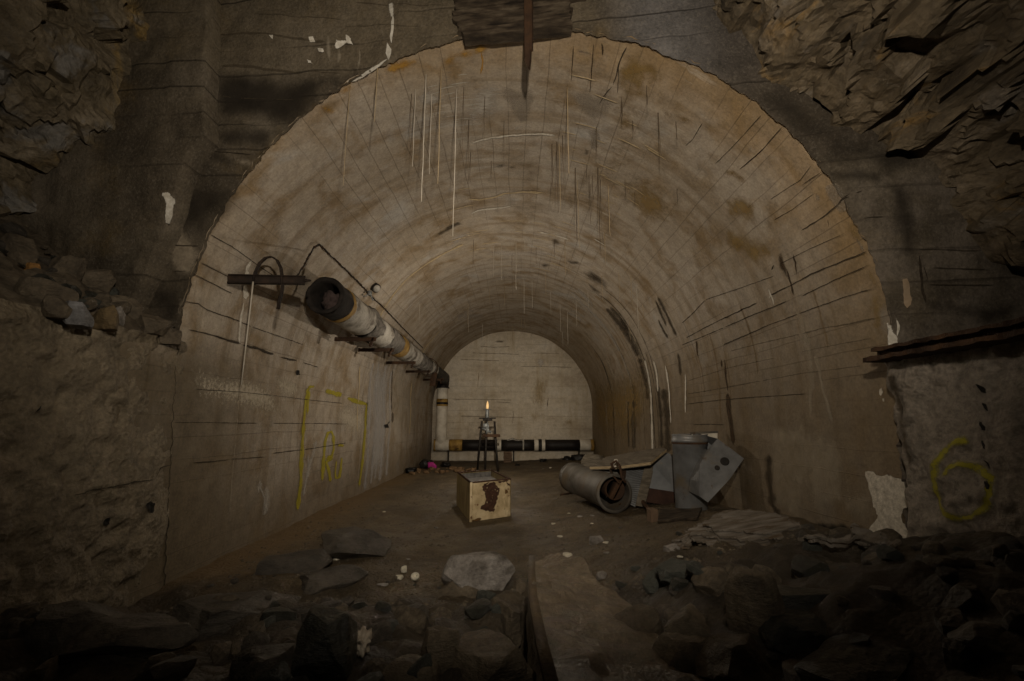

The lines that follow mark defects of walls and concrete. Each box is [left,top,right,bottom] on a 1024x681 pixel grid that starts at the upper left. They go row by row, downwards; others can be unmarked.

crack [571,44,626,104]
crack [716,117,782,169]
crack [682,167,884,345]
peeling [903,278,912,308]
peeling [672,471,908,547]